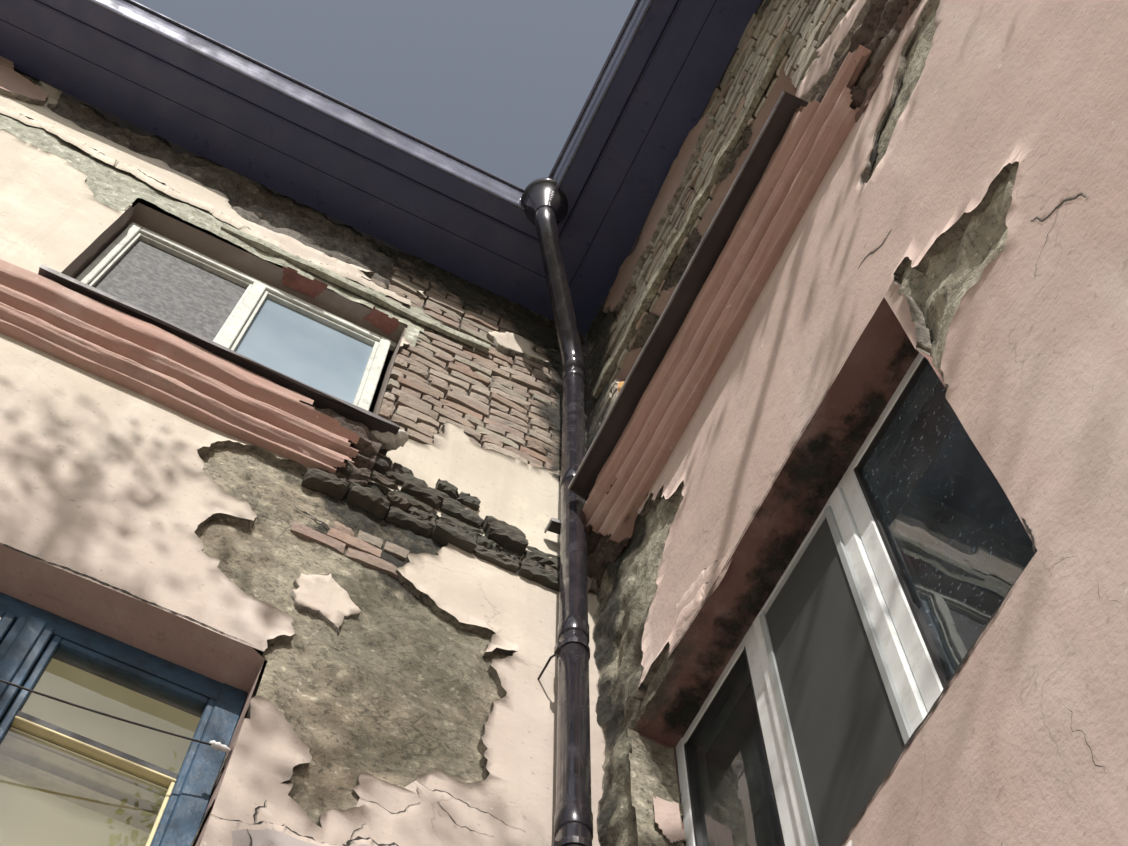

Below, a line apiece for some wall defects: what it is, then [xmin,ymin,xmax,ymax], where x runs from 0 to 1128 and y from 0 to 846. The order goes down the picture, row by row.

spalling [0,447,508,824]